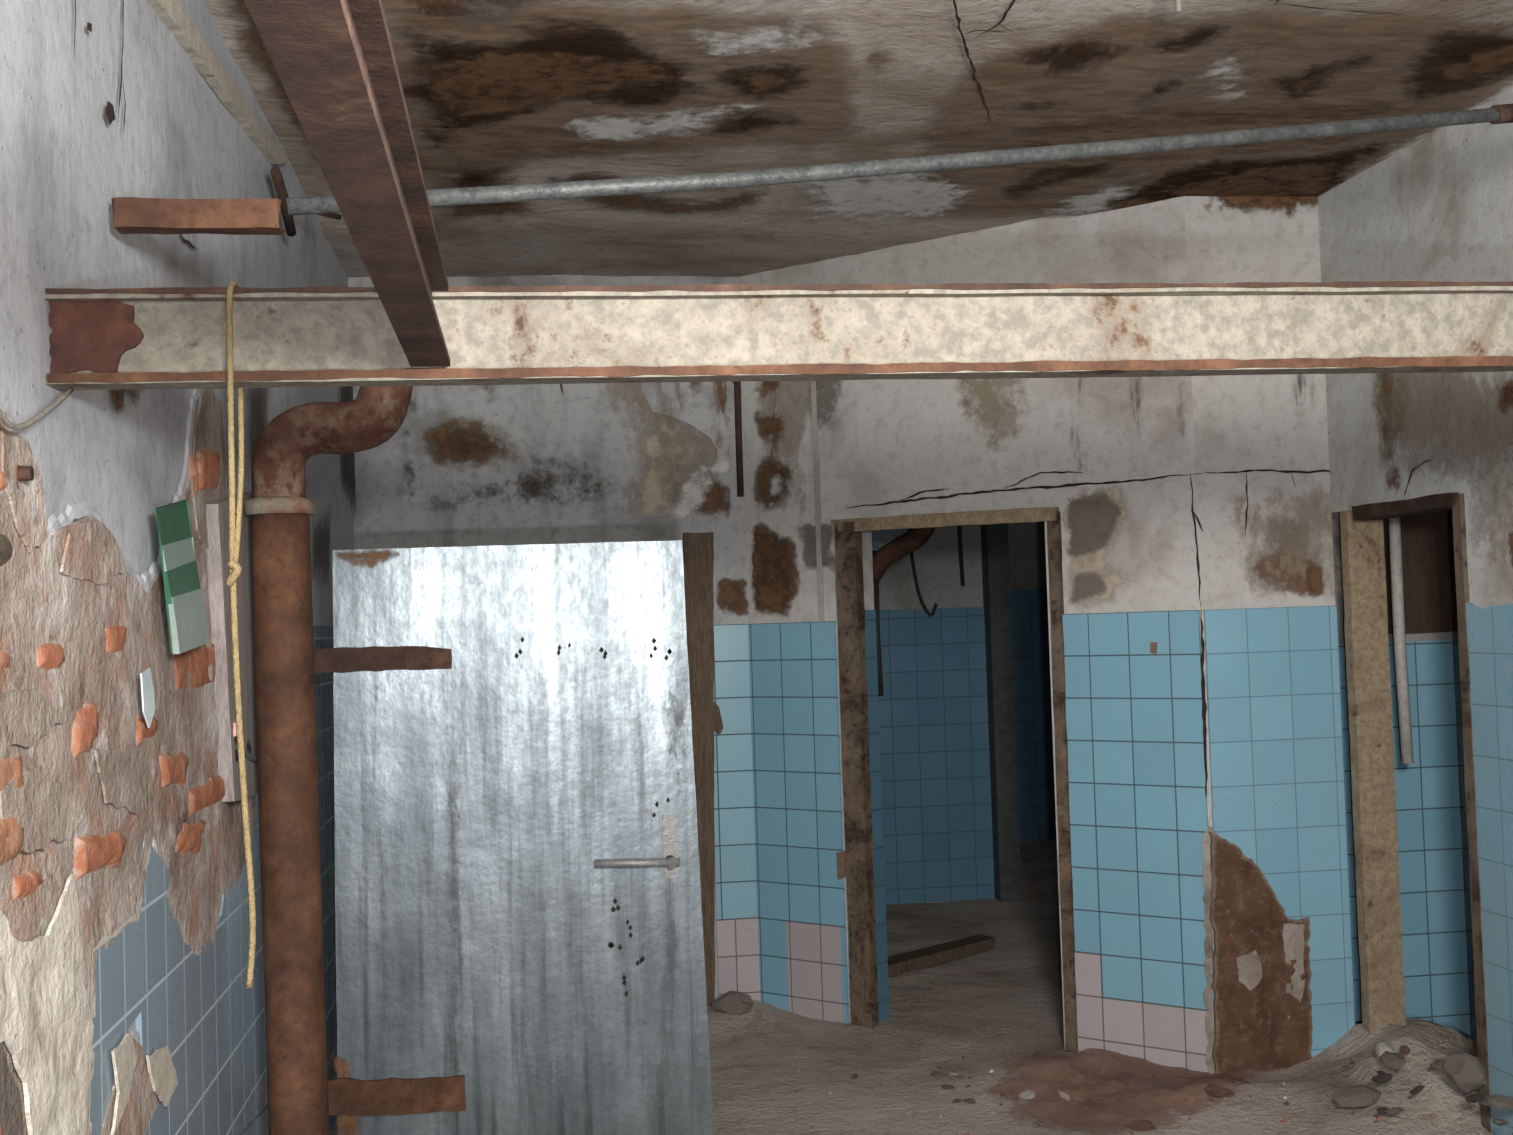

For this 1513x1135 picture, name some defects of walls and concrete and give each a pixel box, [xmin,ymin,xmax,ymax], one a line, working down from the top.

damp [233,0,315,157]
damp [382,0,855,217]
crack [953,0,1015,121]
damp [921,7,1513,218]
rust [49,300,144,373]
rust [112,389,139,410]
rust [338,550,399,567]
spalling [717,524,799,616]
crack [847,469,1330,798]
spalling [1064,486,1128,606]
spalling [0,389,256,1135]
spalling [1202,826,1313,1075]